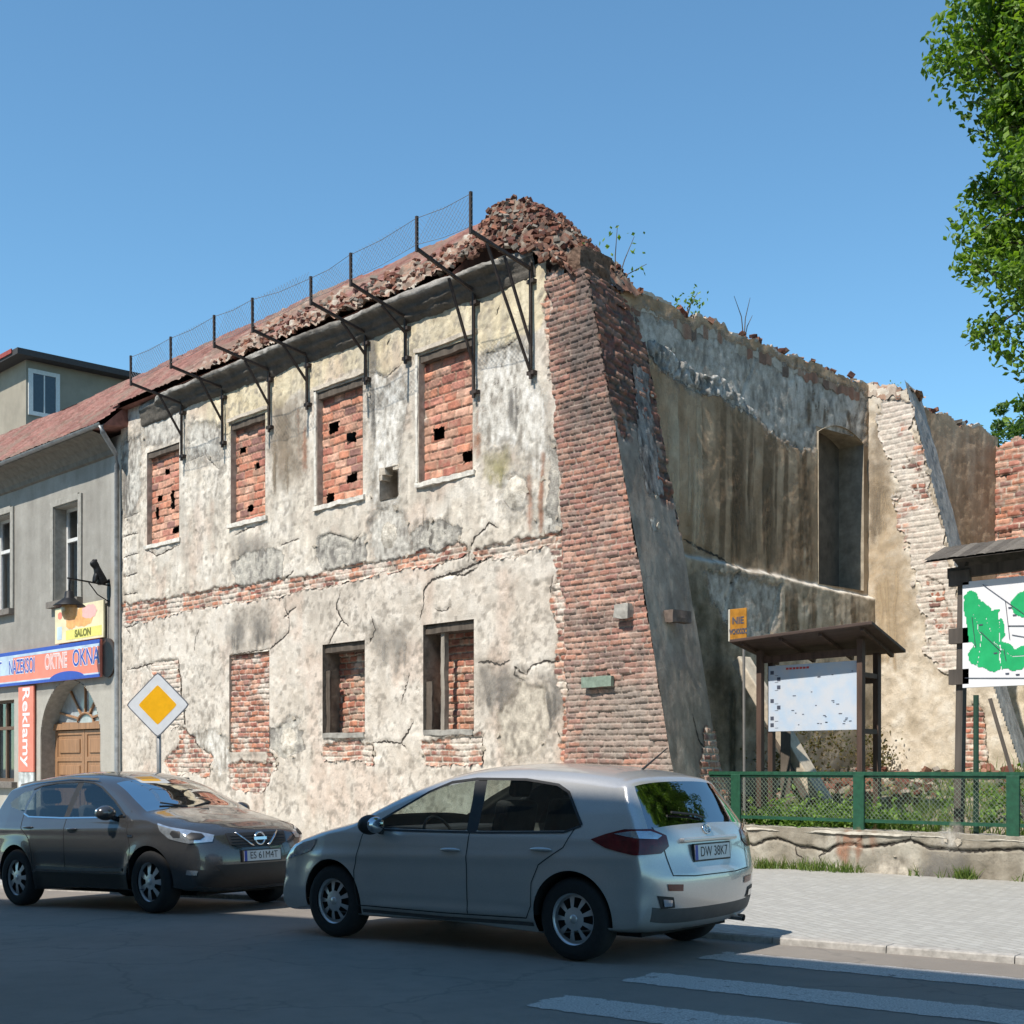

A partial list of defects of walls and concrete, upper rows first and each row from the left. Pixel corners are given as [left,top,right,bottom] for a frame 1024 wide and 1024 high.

spalling [121,268,570,767]
damp [669,401,703,545]
damp [720,425,788,573]
spalling [632,306,957,674]
damp [801,447,812,565]
crack [328,581,376,645]
crack [419,522,498,620]
flaking render [164,709,305,794]
crack [373,674,414,746]
crack [478,660,558,680]
crack [750,834,1024,861]